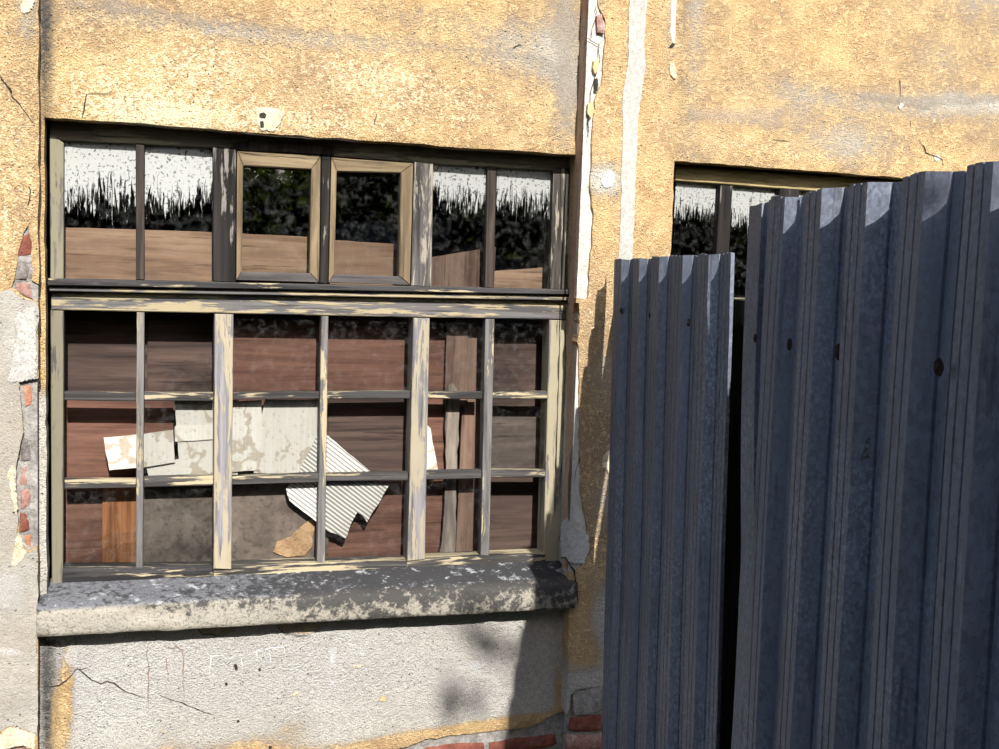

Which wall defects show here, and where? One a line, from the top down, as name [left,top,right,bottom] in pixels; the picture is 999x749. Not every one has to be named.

peeling [20,0,35,13]
crack [0,76,35,124]
flaking render [574,0,605,299]
peeling [601,171,615,188]
flaking render [12,226,39,301]
flaking render [560,312,590,573]
flaking render [7,379,39,567]
peeling [0,727,36,749]
crack [45,668,212,715]
flaking render [398,689,602,749]